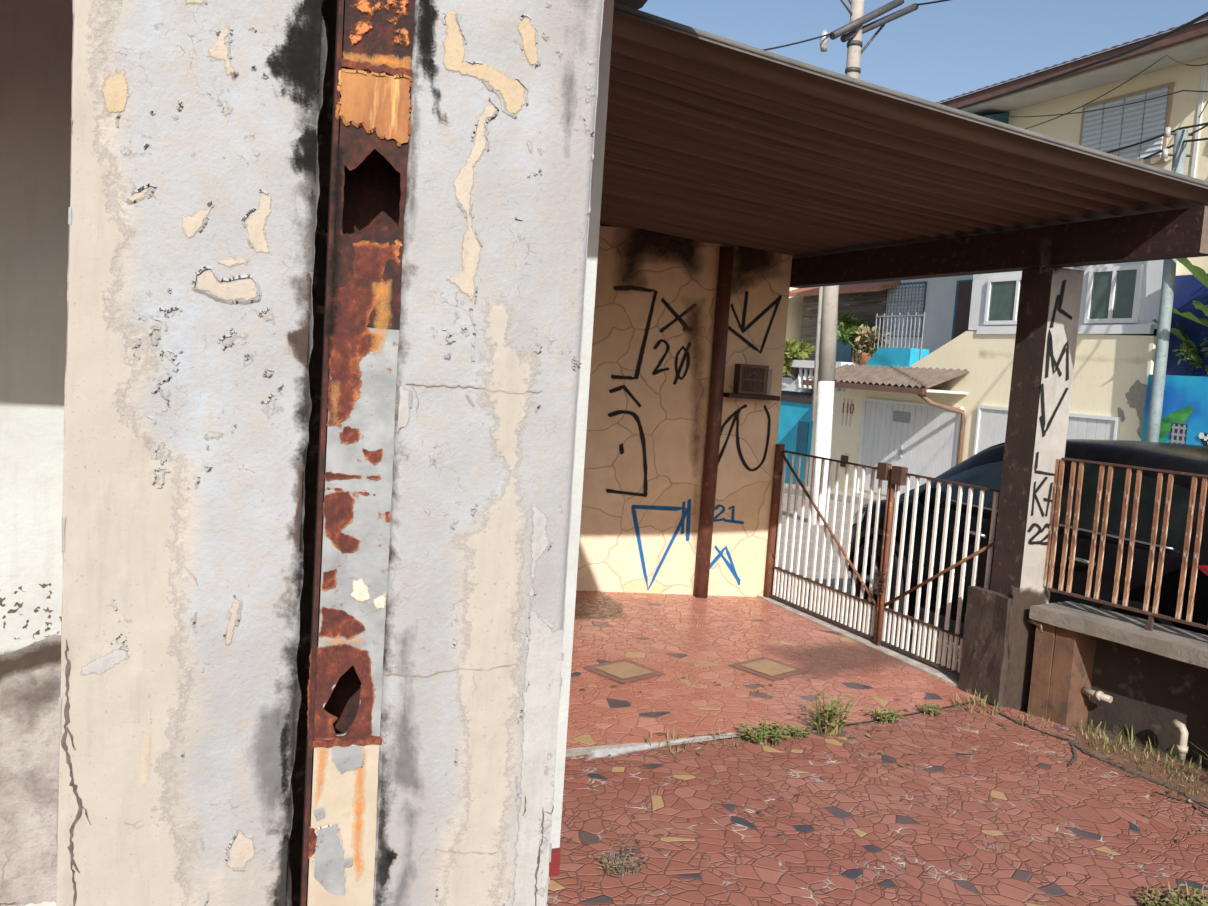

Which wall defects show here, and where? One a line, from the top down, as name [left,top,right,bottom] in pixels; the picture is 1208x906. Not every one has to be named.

peeling [208,25,269,115]
water stain [265,0,321,200]
rust [346,0,410,69]
water stain [417,0,446,121]
peeling [191,189,275,334]
peeling [0,0,214,906]
rust [323,240,402,553]
peeling [432,10,564,906]
water stain [0,642,61,680]
crack [50,639,91,906]
rust [322,568,337,591]
rust [307,606,375,796]